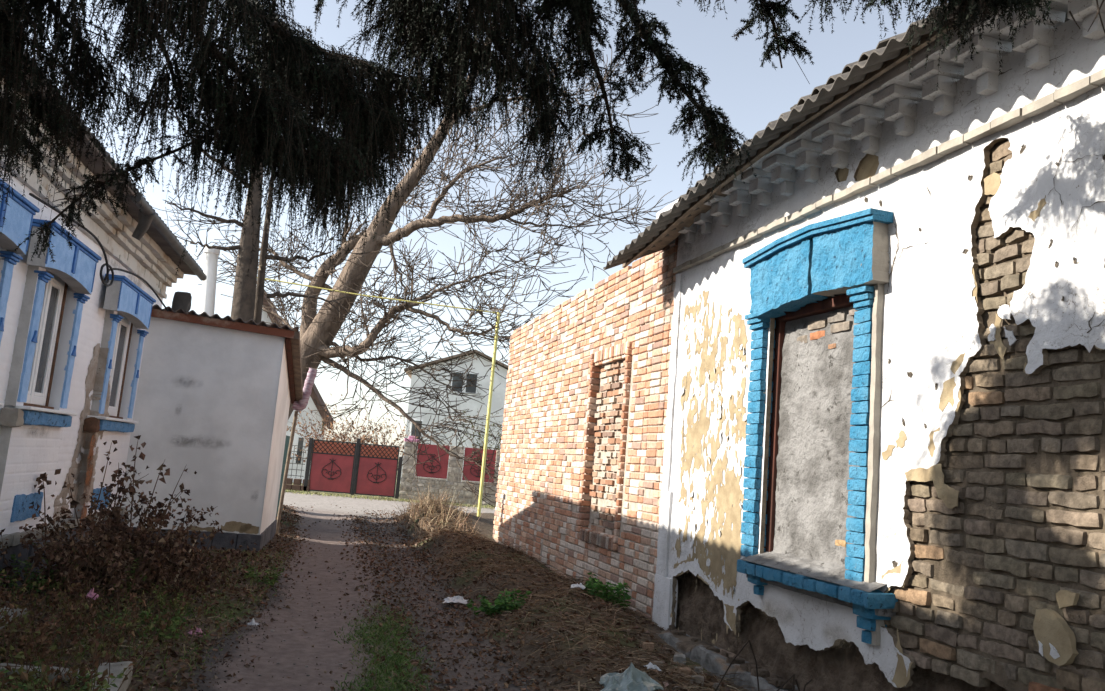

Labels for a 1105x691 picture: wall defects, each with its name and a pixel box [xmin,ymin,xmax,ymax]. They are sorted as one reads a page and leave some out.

crack [1049,139,1105,239]
peeling [53,343,110,522]
flaking render [667,139,1105,691]